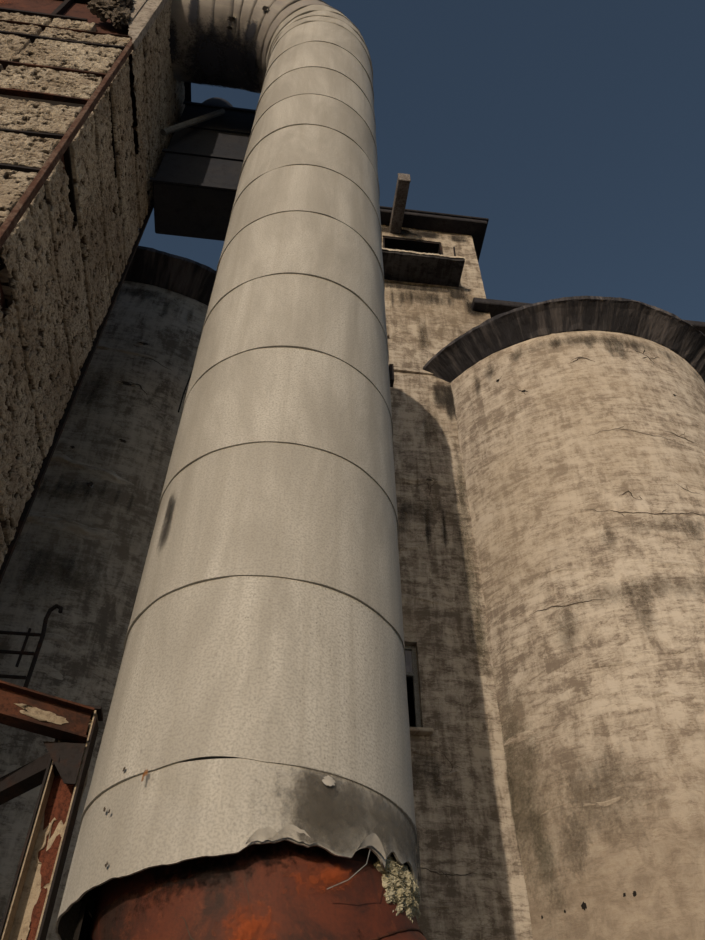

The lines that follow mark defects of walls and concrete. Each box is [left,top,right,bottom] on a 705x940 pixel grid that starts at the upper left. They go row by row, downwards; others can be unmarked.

leakage [168,21,178,63]
leakage [446,391,456,418]
crack [591,481,703,517]
crack [534,599,605,613]
peeling [14,703,68,725]
peeling [21,771,88,940]